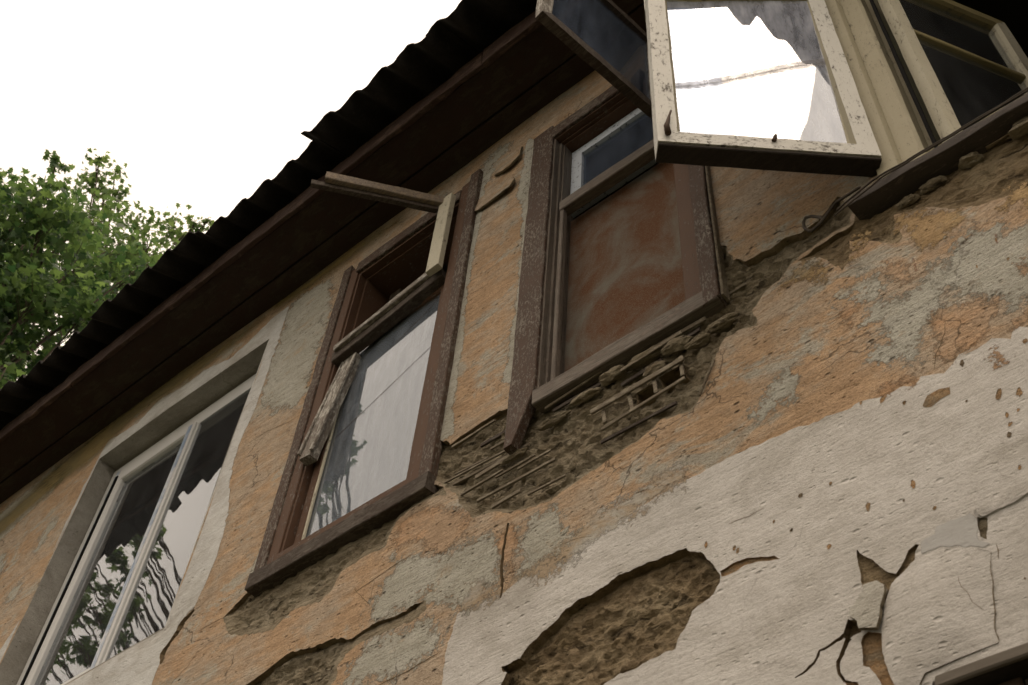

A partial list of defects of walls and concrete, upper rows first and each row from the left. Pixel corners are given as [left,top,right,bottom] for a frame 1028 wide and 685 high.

spalling [223,133,1028,685]
crack [500,524,509,598]
crack [795,544,919,685]